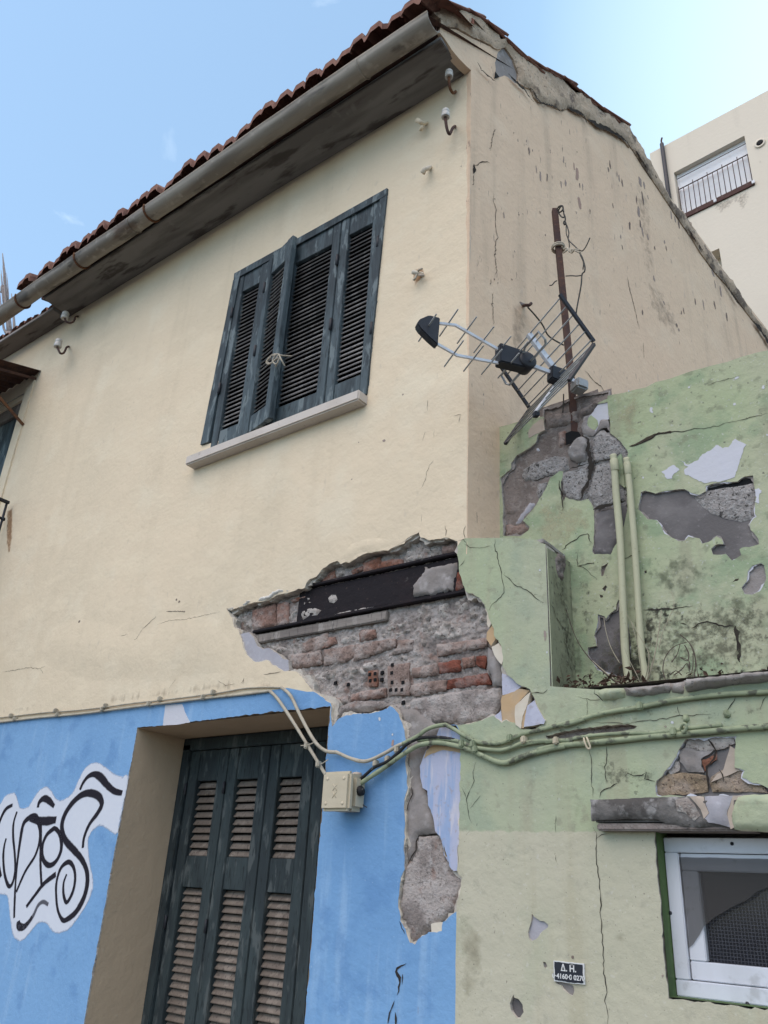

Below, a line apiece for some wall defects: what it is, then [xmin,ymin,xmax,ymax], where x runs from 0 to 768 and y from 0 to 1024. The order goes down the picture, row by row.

crack [473,133,498,320]
peeling [620,177,667,250]
flaking render [227,533,548,943]
flaking render [501,388,628,598]
crack [445,528,741,795]
flaking render [588,600,631,677]
crack [534,413,766,573]
flaking render [640,439,762,560]
flaking render [656,736,768,797]
flaking render [736,563,766,595]
crack [388,964,405,1024]
crack [595,831,608,1024]